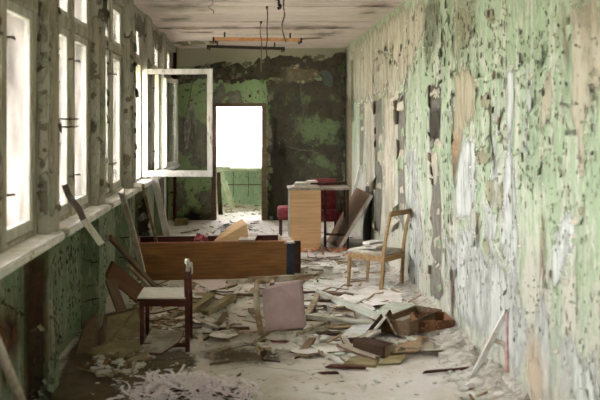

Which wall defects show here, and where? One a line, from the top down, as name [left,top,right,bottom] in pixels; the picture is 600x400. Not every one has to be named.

peeling [36,0,63,220]
peeling [91,0,111,197]
peeling [123,13,215,180]
damp [268,119,287,219]
peeling [171,0,600,400]
flaking render [18,235,81,400]